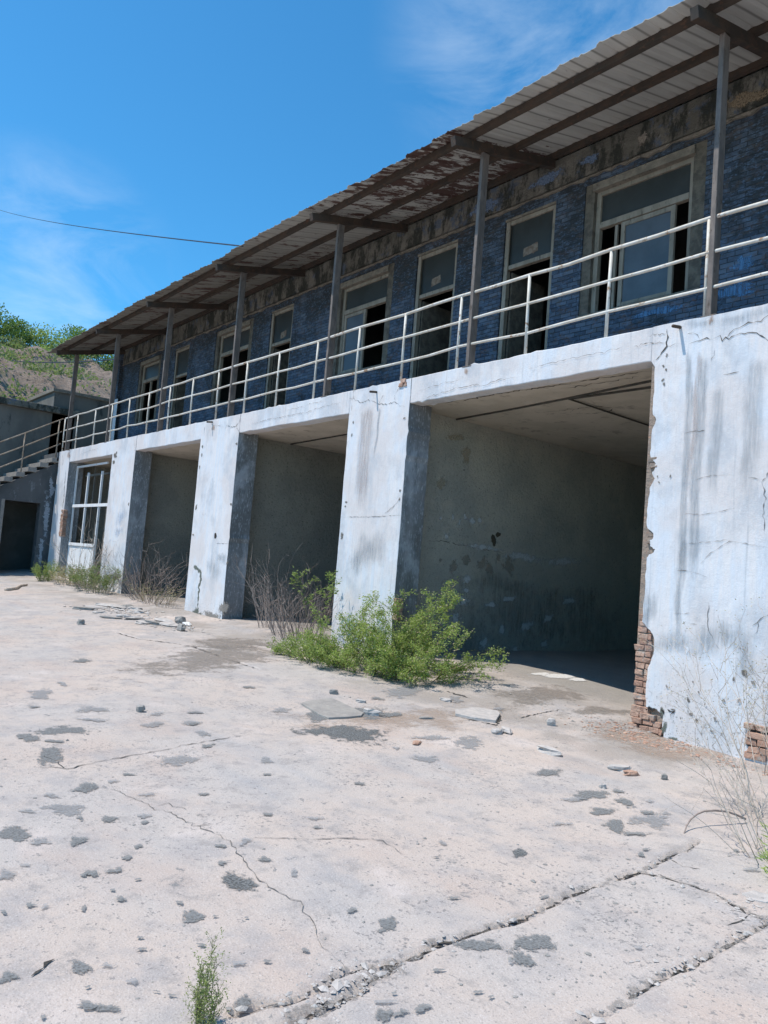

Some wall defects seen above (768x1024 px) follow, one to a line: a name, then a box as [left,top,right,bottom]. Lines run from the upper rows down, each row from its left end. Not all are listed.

crack [424,315,768,413]
flaking render [628,614,663,736]
spalling [744,722,768,762]